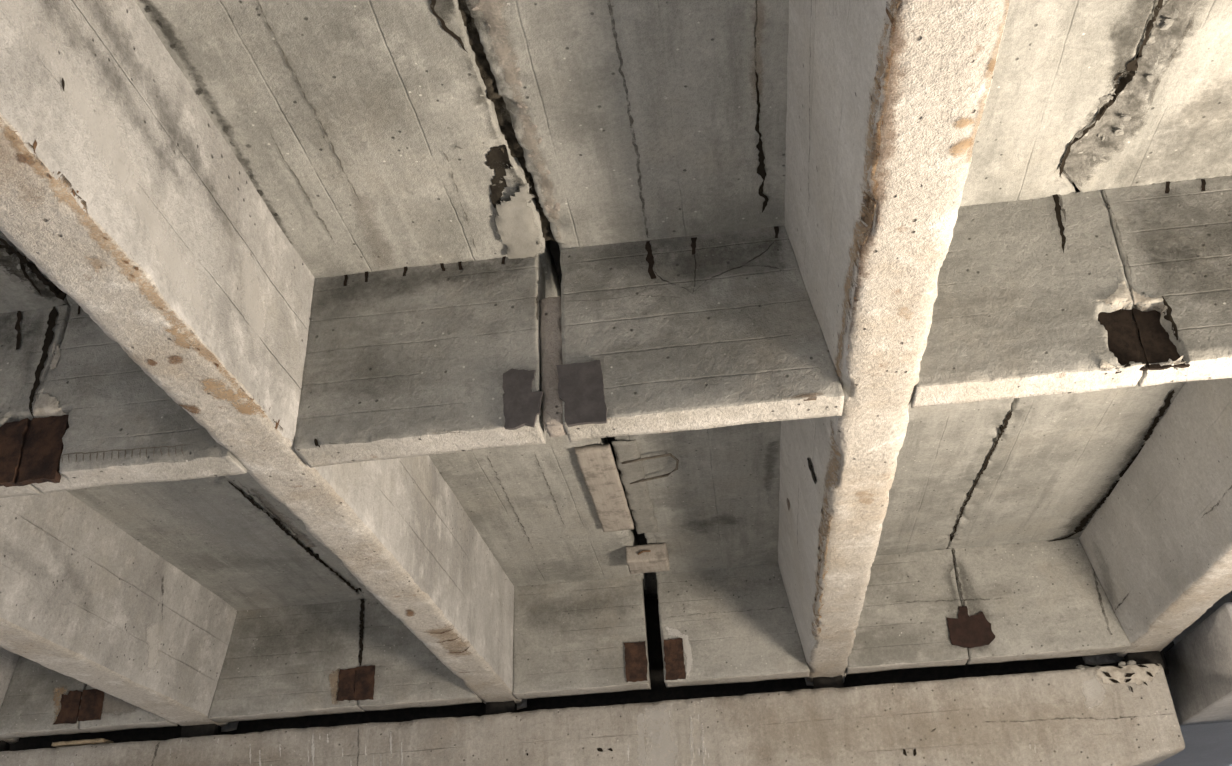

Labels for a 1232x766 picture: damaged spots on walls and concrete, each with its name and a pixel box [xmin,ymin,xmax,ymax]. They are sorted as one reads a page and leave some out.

crack [430,0,468,53]
crack [607,4,648,237]
crack [754,0,769,213]
spalling [1064,0,1203,186]
spalling [0,242,56,299]
crack [0,238,67,418]
crack [656,241,784,292]
crack [227,480,365,666]
crack [950,411,1012,605]
crack [1048,390,1175,542]
spalling [1095,663,1161,692]